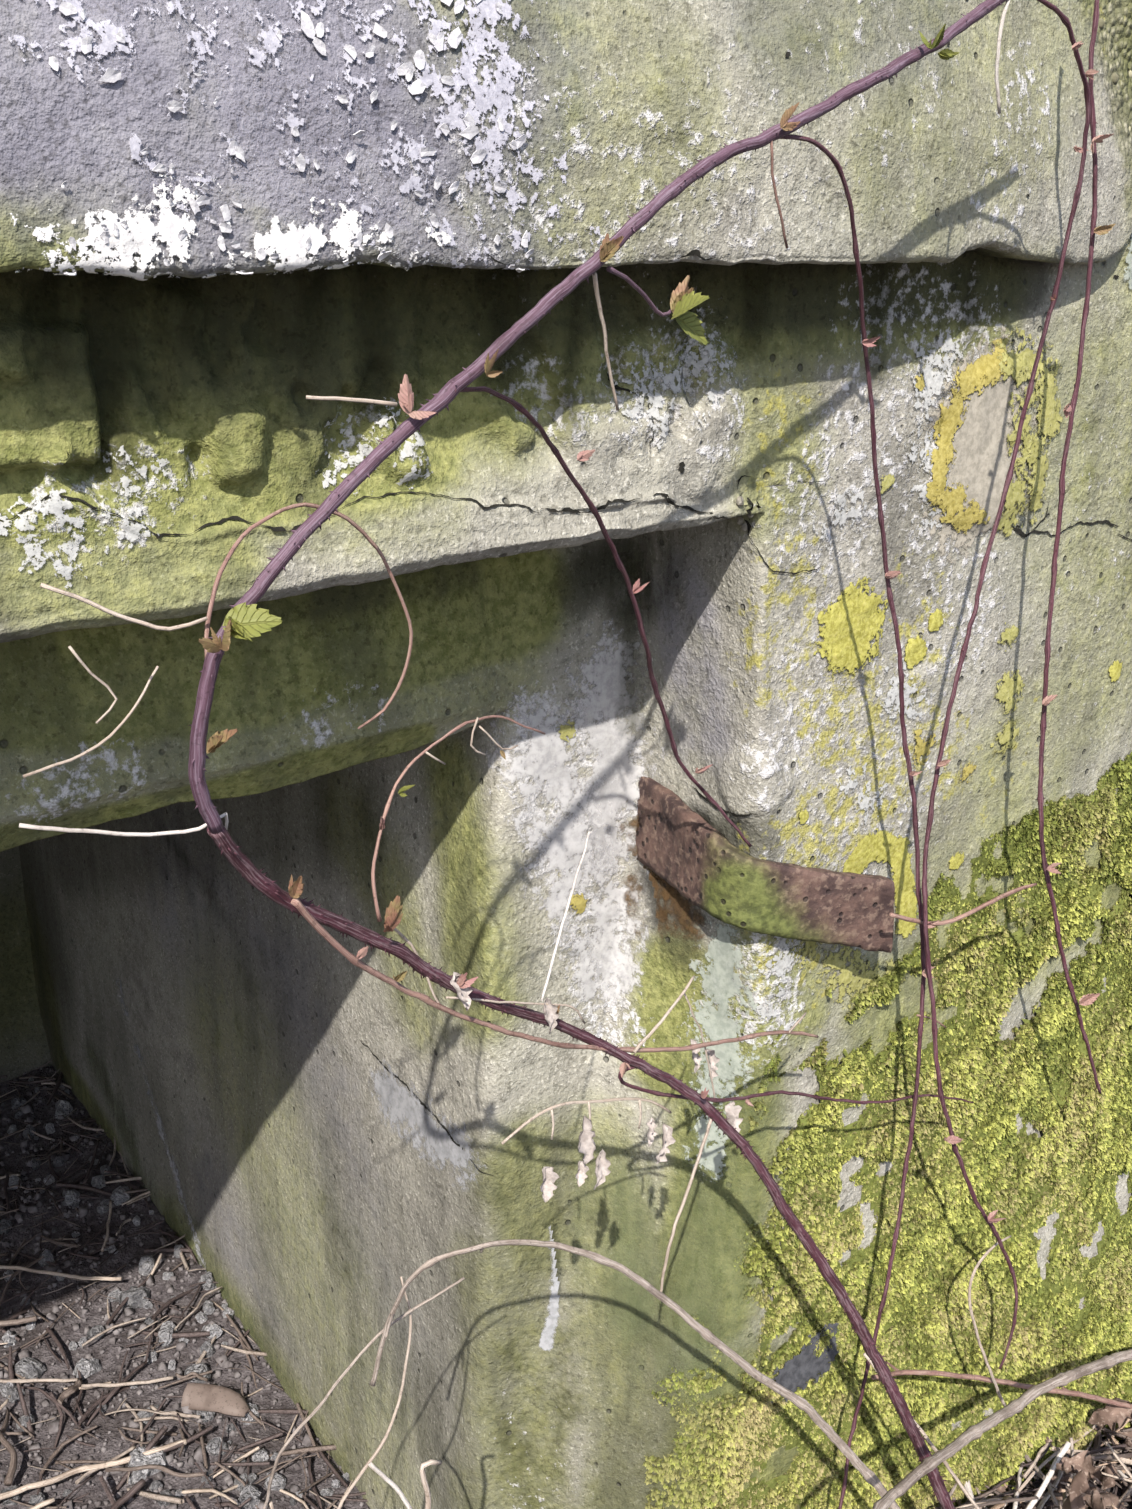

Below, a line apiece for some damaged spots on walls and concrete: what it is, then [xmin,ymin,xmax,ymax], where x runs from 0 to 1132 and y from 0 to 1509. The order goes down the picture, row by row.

peeling [8,0,581,273]
crack [6,491,823,575]
crack [1011,504,1132,540]
corrosion [624,845,704,939]